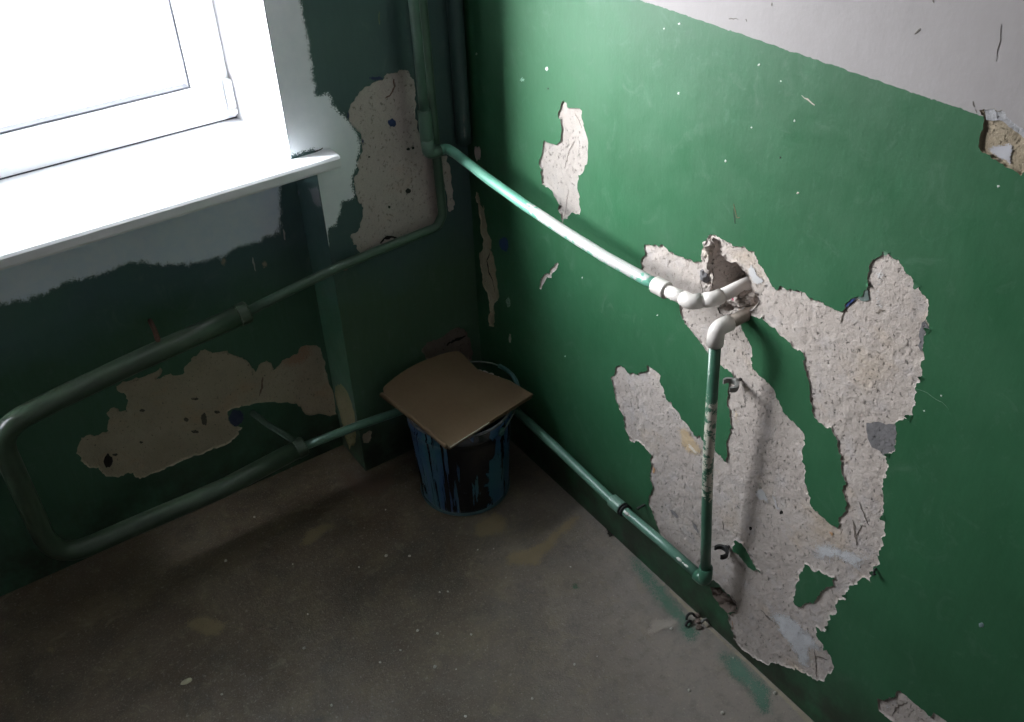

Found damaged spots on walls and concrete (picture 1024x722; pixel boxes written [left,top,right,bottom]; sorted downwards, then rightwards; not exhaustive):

peeling [347,70,455,253]
peeling [539,101,588,222]
spalling [978,109,1024,175]
peeling [475,192,499,327]
peeling [76,345,372,479]
peeling [611,234,930,683]
peeling [877,691,947,722]